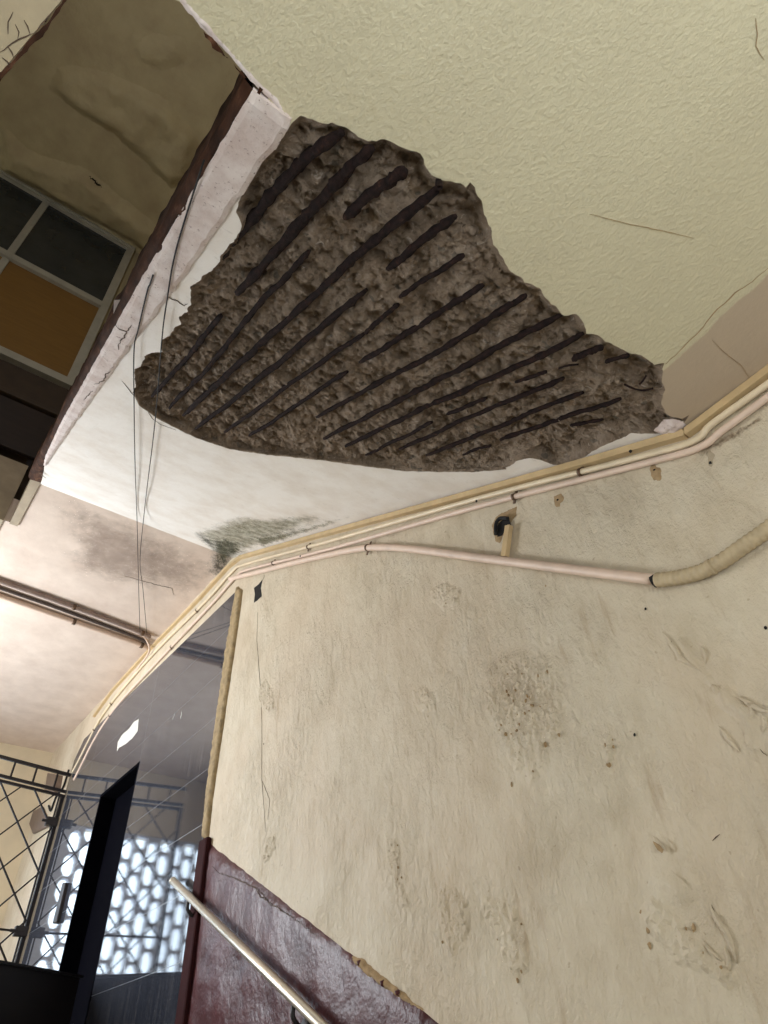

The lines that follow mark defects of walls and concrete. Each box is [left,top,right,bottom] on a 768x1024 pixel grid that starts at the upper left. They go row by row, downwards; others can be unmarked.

spalling [28,0,689,483]
crack [591,214,691,238]
crack [666,268,768,377]
mould [202,518,325,571]
peeling [484,649,569,787]